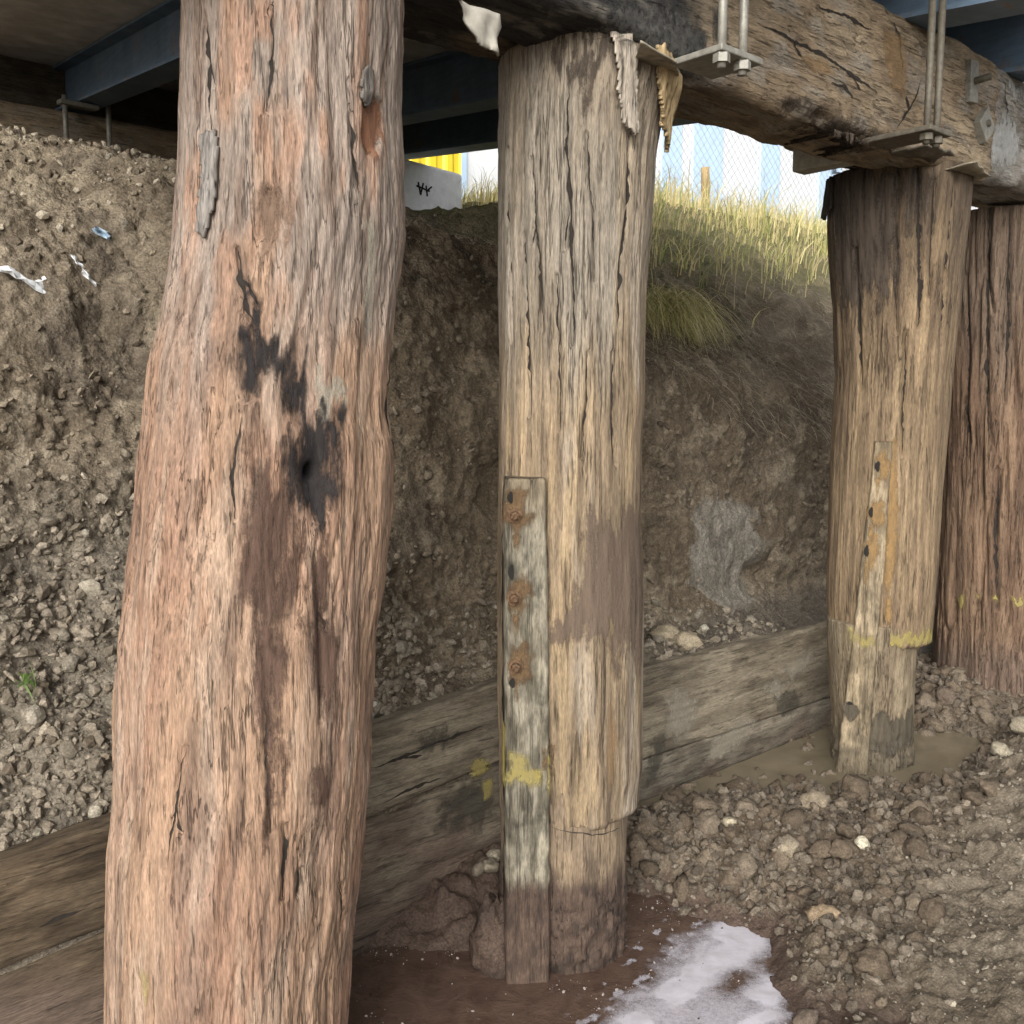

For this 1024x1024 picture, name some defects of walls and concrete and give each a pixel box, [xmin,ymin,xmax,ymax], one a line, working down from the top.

crack [759,23,874,98]
crack [818,4,921,128]